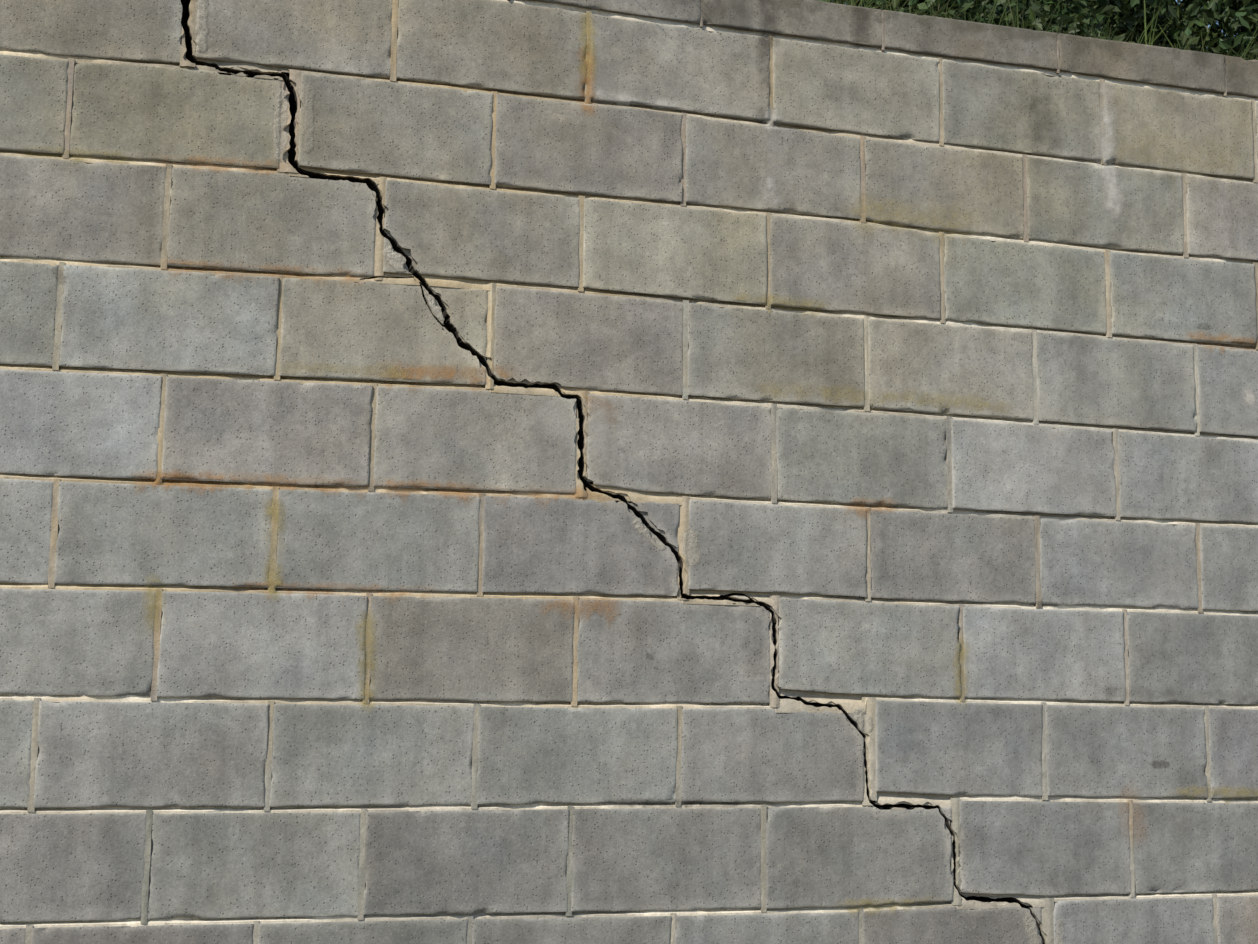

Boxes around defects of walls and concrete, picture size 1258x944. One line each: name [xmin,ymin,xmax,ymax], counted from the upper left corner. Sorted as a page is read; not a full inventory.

crack [180,0,1045,944]